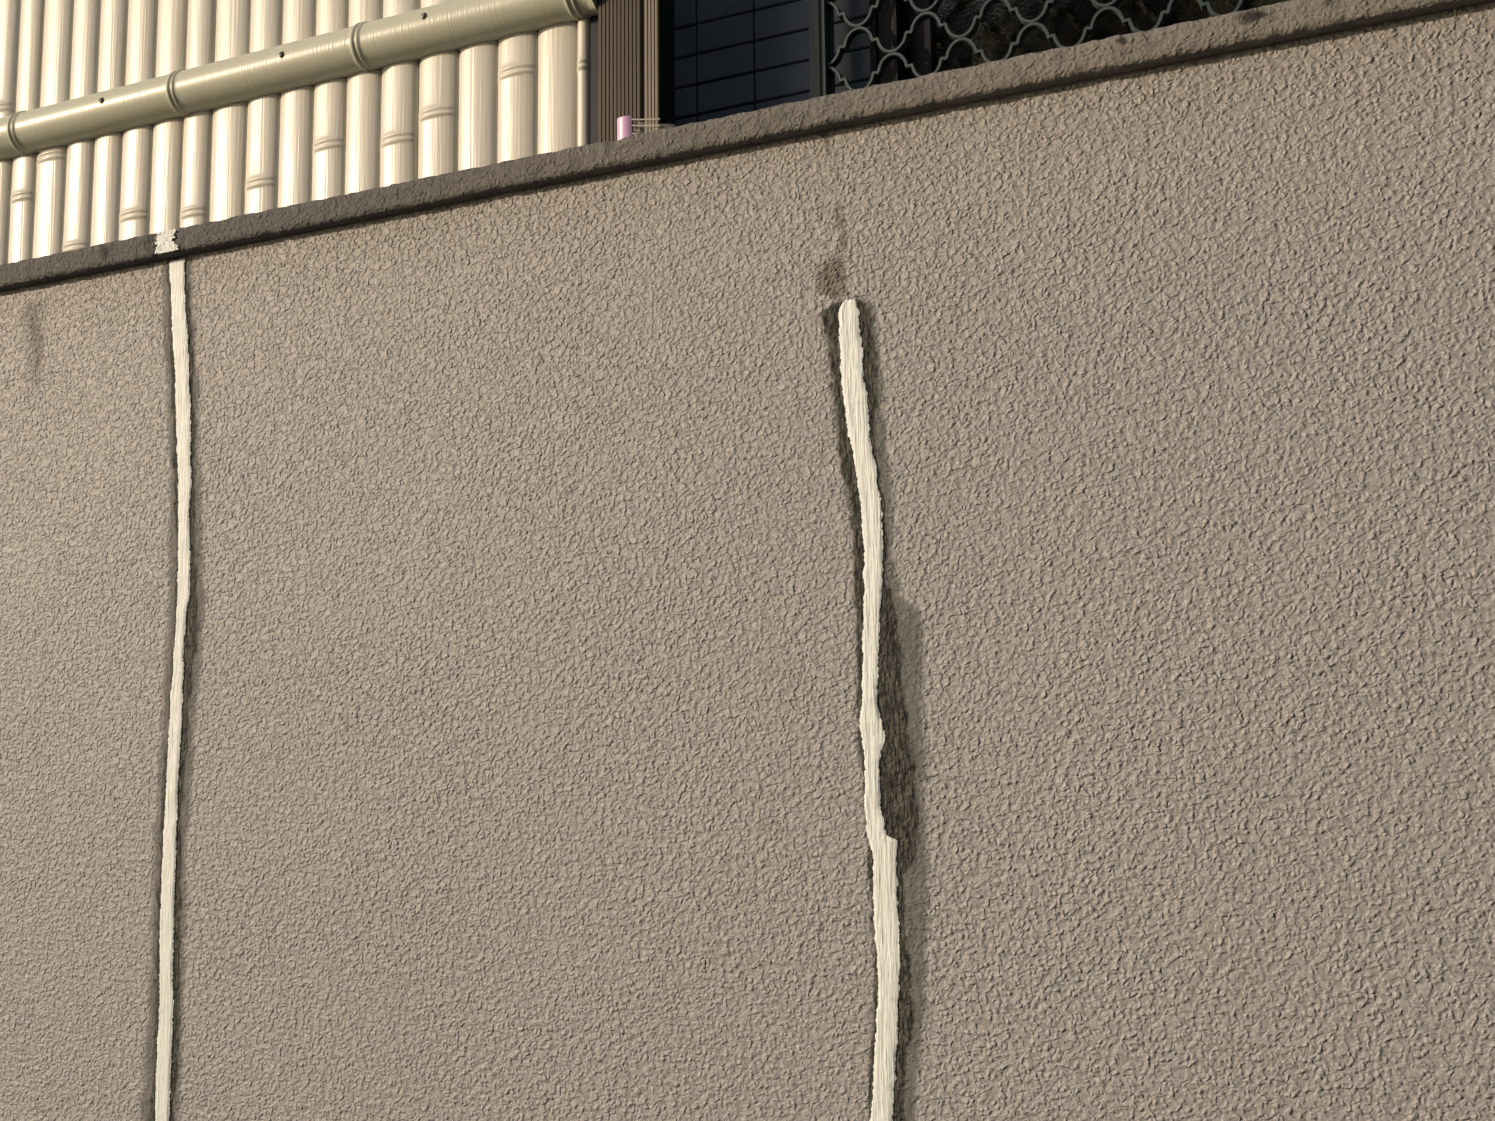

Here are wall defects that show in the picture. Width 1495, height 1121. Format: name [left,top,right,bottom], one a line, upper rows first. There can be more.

crack [141,256,204,1121]
crack [820,299,925,1121]